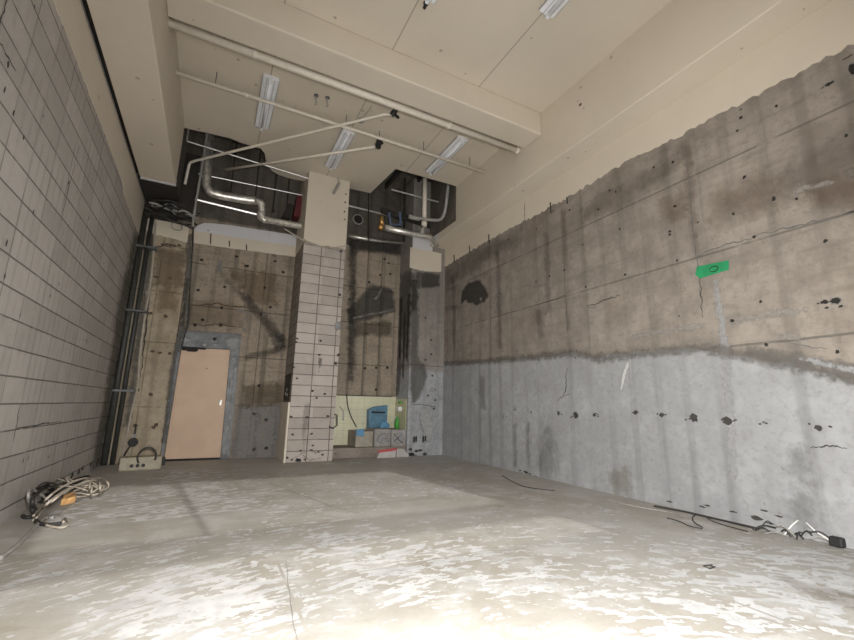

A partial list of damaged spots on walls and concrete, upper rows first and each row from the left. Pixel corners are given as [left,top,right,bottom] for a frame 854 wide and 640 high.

crack [0,0,16,71]
water stain [461,280,488,305]